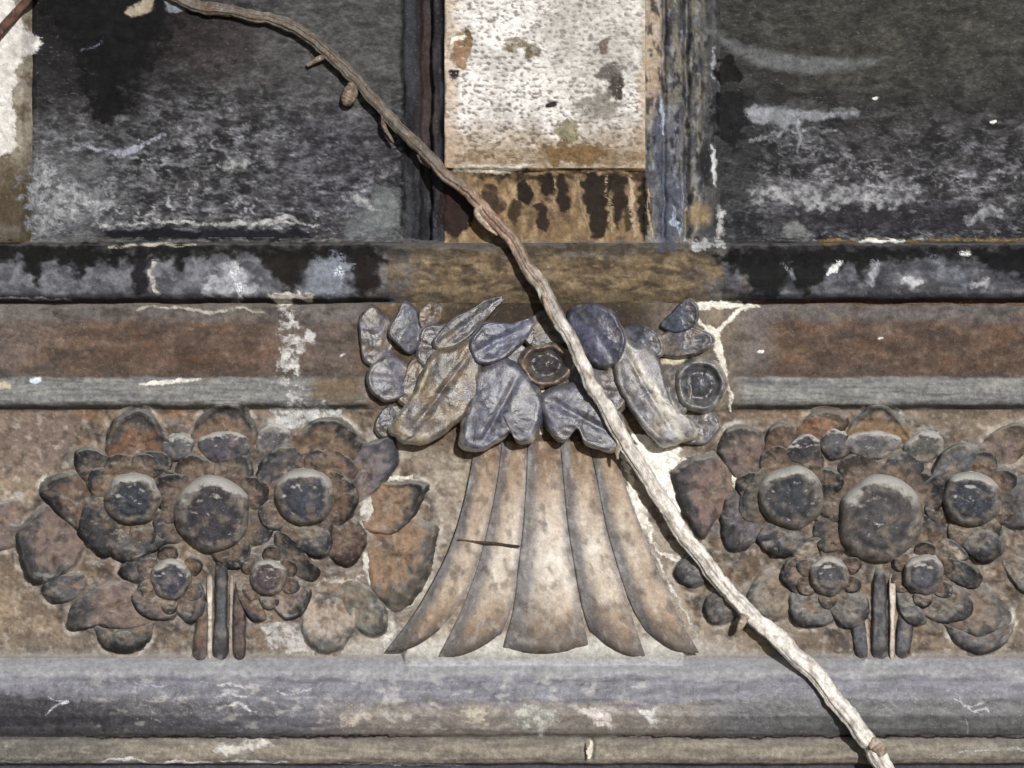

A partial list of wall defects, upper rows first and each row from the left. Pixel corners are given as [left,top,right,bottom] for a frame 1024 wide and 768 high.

damp [683,16,888,76]
peeling [0,0,43,156]
damp [76,133,166,157]
damp [223,156,251,170]
damp [453,98,685,251]
damp [746,105,858,153]
damp [437,183,474,238]
damp [0,159,402,434]
damp [697,185,1024,412]
damp [661,355,696,366]